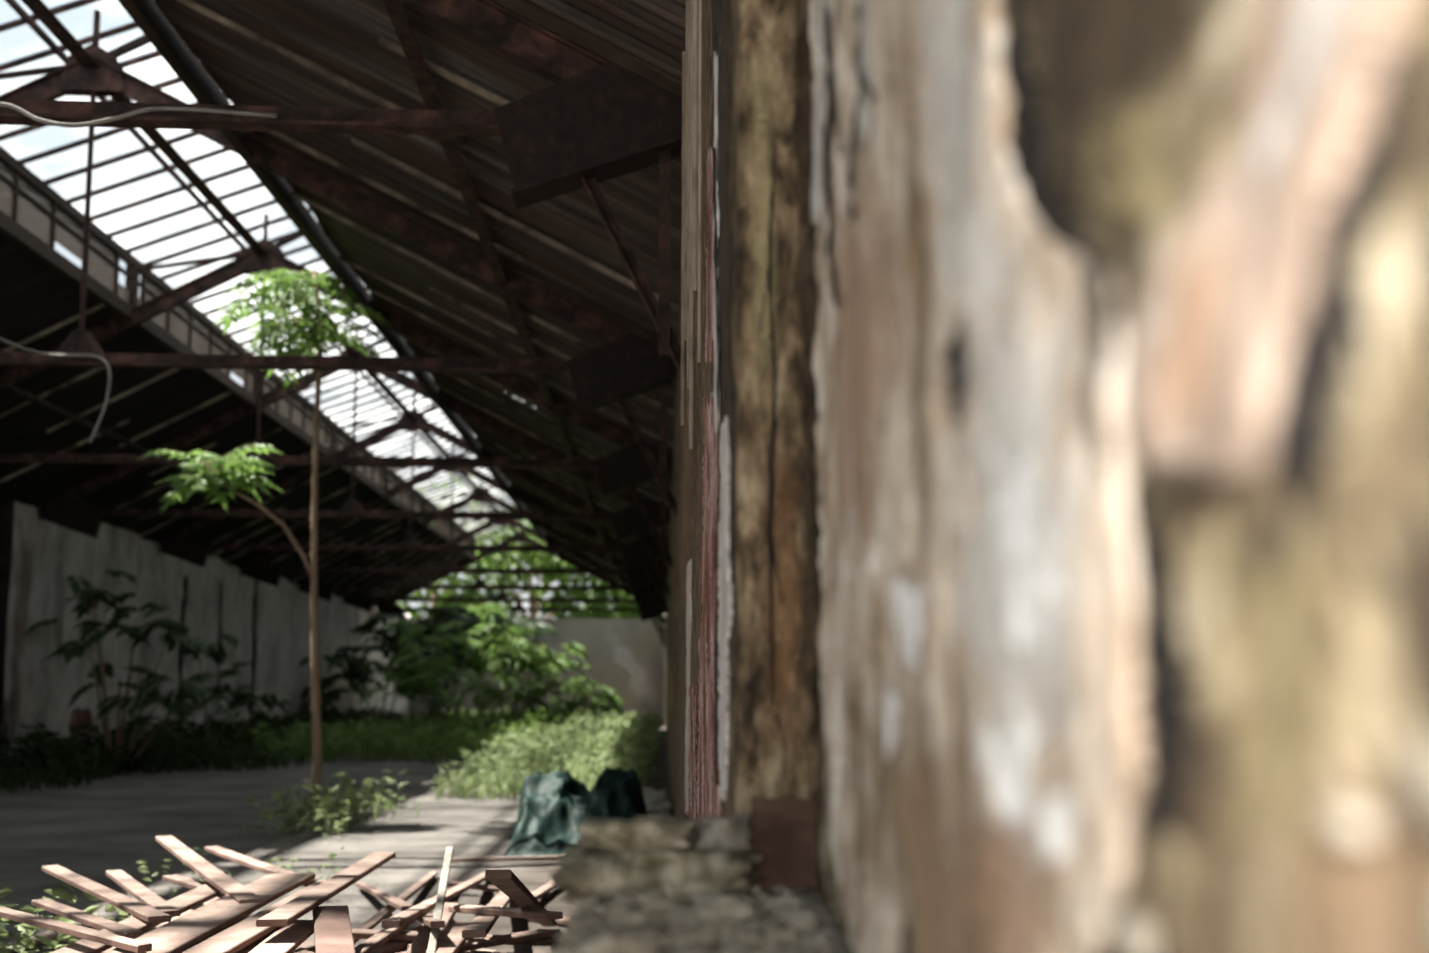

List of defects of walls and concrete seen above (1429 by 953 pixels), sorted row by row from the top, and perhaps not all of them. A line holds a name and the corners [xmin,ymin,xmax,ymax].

crack [823,2,877,308]